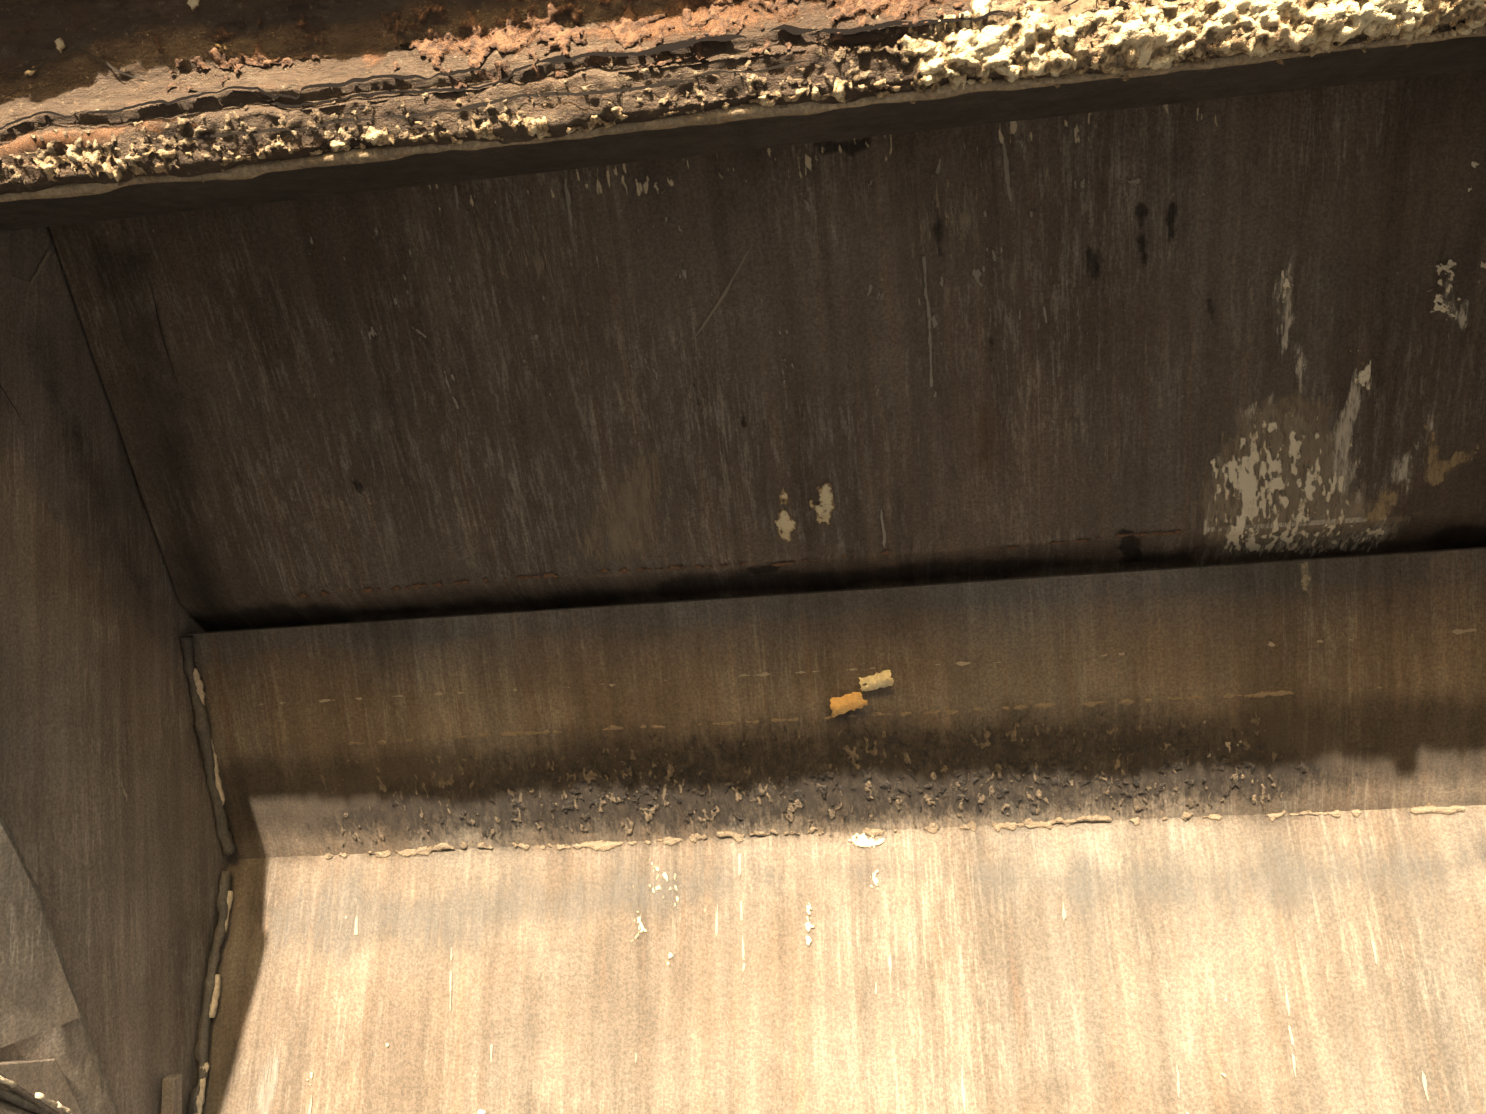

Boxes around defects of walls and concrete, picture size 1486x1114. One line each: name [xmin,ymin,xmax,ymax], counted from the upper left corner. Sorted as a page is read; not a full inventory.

crack [0,10,1011,141]
corrosion [366,0,799,89]
corrosion [816,0,964,43]
peeling [649,0,1486,118]
peeling [219,106,628,166]
peeling [1350,350,1372,390]
peeling [1210,401,1390,559]